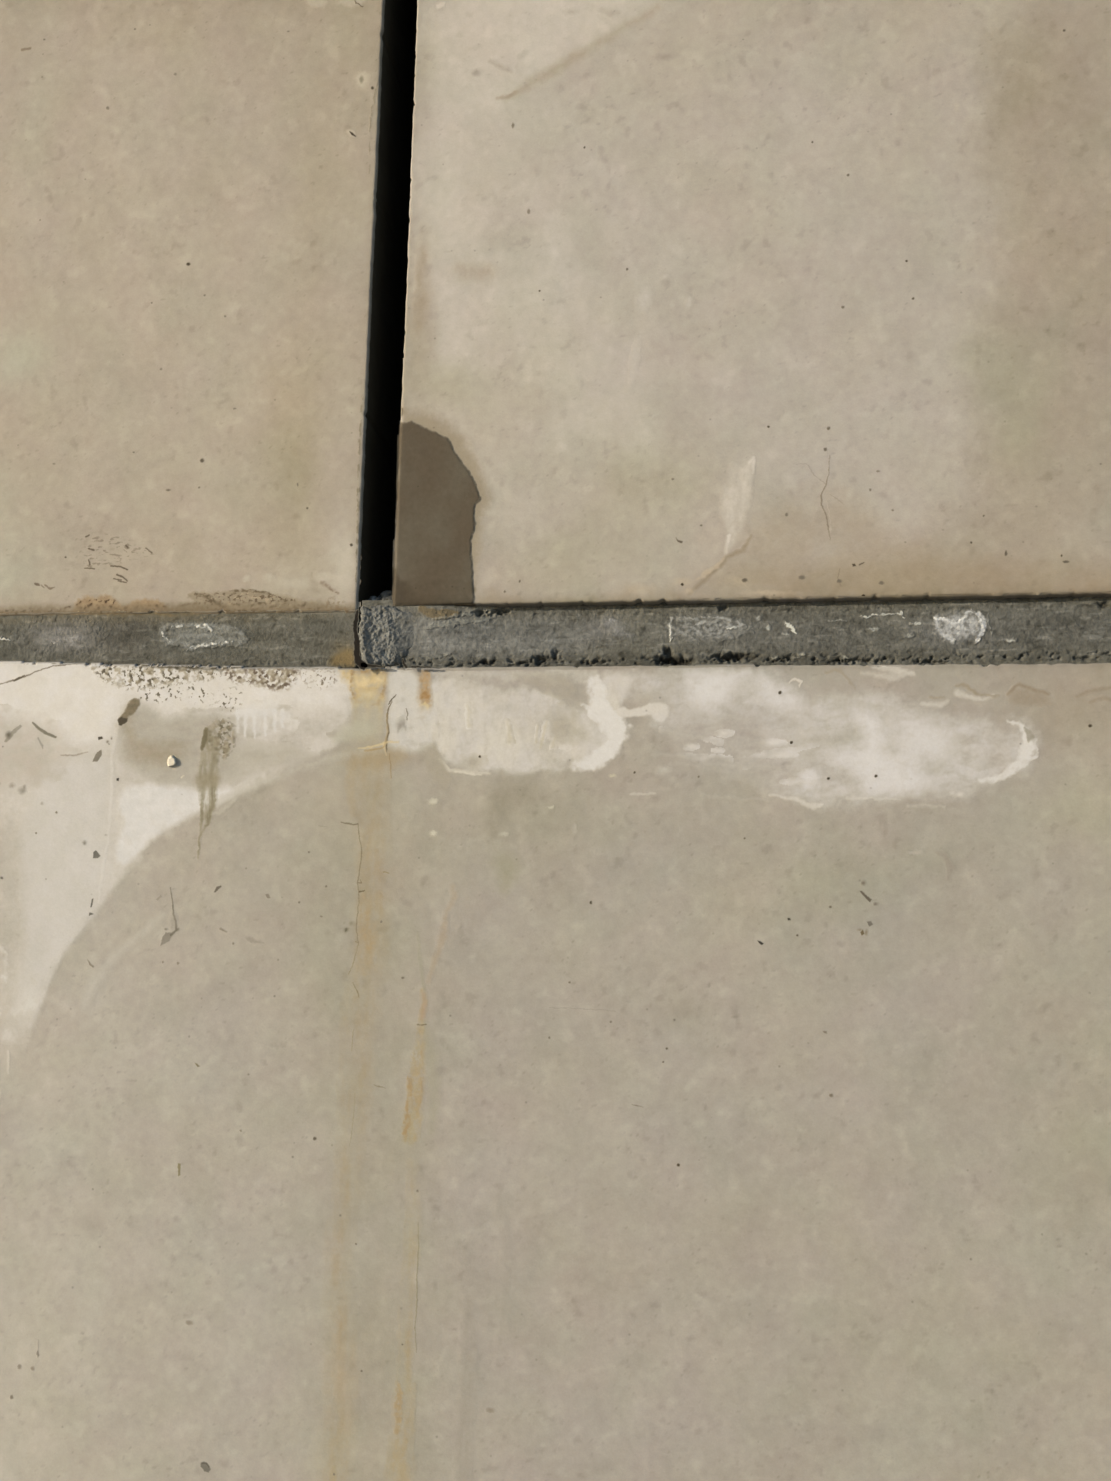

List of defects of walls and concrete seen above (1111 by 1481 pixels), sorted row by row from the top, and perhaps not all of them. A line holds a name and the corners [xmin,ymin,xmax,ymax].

rust [326,645,390,744]
rust [418,670,434,706]
water stain [0,454,1111,1481]